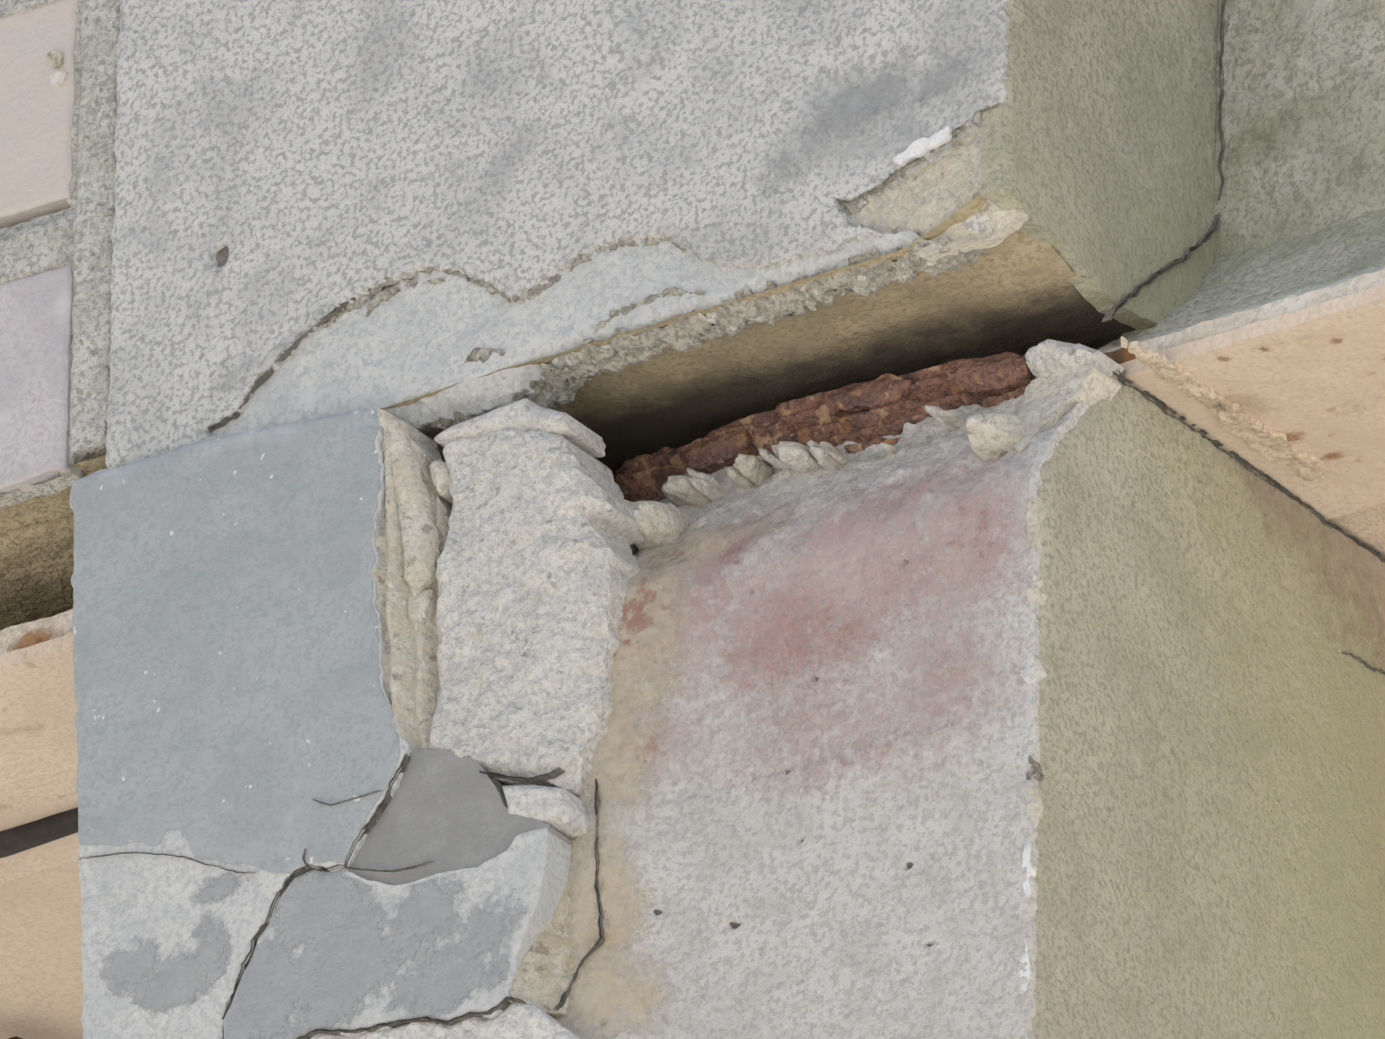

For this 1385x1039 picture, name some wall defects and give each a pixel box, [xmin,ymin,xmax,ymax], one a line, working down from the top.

crack [1101,0,1227,323]
corrosion [824,373,915,418]
corrosion [946,356,1037,400]
corrosion [682,428,759,474]
peeling [71,105,1030,1039]
crack [1342,652,1385,675]
crack [79,754,433,1019]
crack [296,996,525,1039]